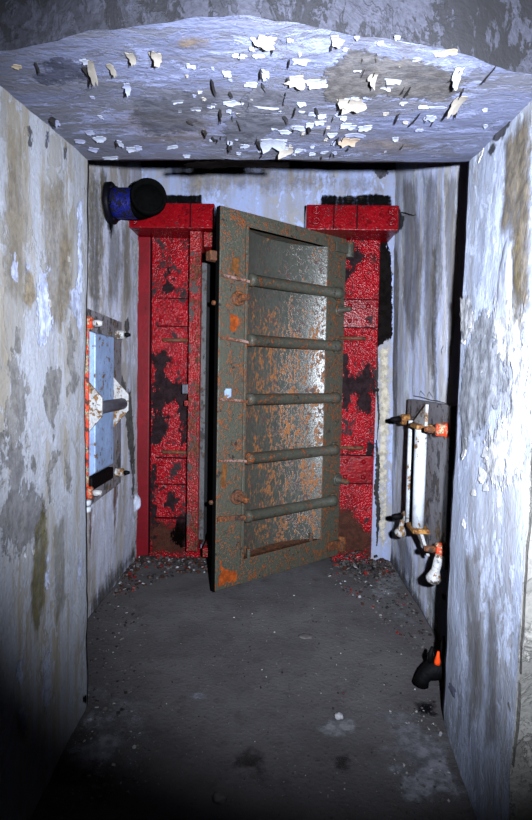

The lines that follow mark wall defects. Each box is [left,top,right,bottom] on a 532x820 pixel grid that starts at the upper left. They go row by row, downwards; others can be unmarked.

peeling [32,56,98,87]
peeling [63,130,142,160]
peeling [122,35,469,169]
peeling [478,121,510,163]
leakage [502,118,532,306]
leakage [25,271,35,308]
peeling [345,246,365,282]
peeling [151,349,188,447]
peeling [342,353,379,416]
leakage [379,252,399,545]
peeling [121,375,187,561]
leakage [32,510,46,627]